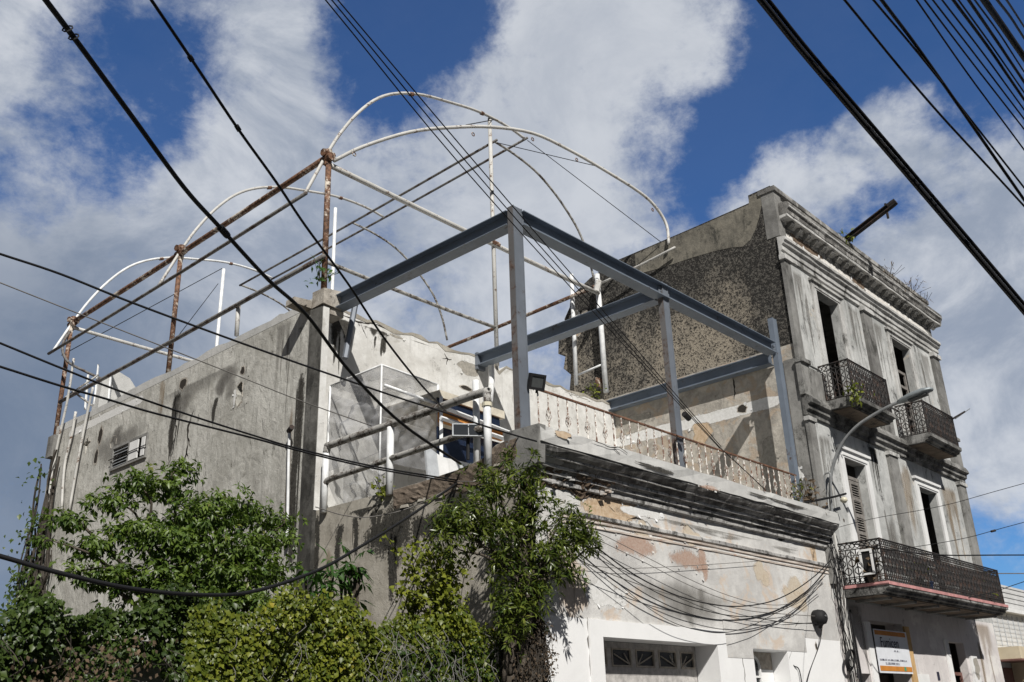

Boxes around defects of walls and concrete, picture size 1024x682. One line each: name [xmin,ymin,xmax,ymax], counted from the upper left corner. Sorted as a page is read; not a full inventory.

damp [168,369,235,461]
flaking render [574,489,665,562]
peeling [672,526,710,581]